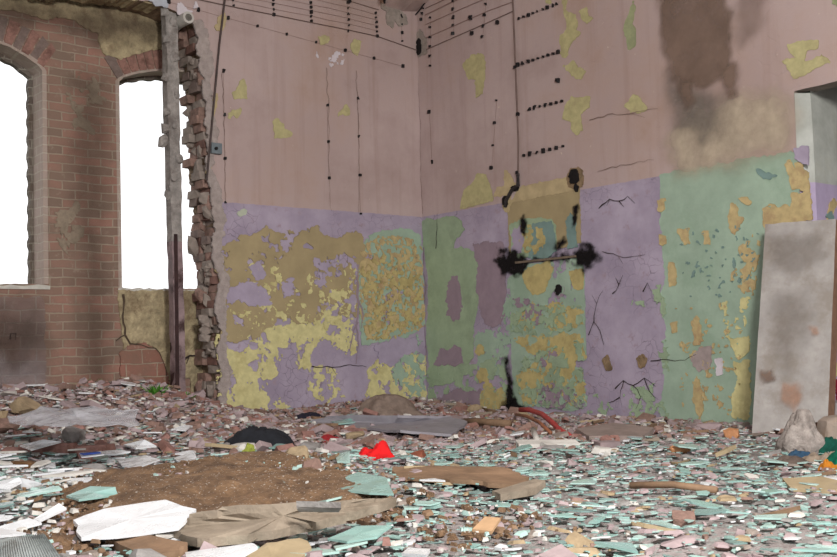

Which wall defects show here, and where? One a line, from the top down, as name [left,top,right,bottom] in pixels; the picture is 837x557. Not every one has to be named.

water stain [661,0,788,171]
peeling [782,40,830,79]
peeling [0,0,613,415]
peeling [825,198,837,220]
crack [116,294,167,376]
crack [588,251,645,344]
crack [609,354,696,408]
peeling [623,145,813,426]